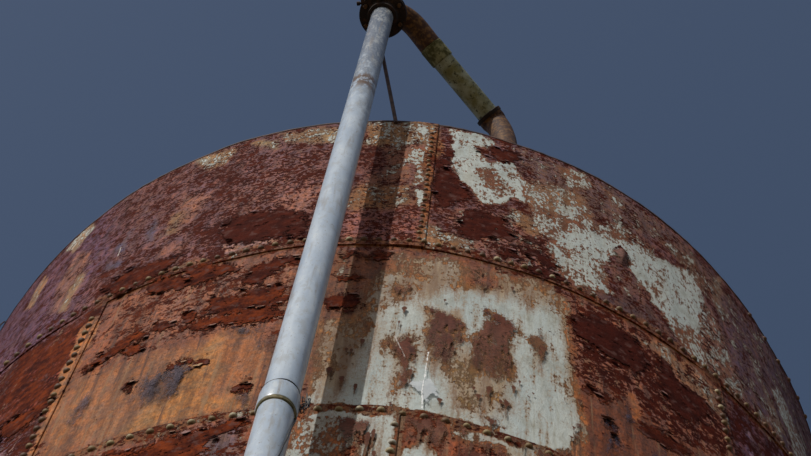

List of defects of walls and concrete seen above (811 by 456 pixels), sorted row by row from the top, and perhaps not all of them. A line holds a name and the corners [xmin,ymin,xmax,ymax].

peeling [429,144,569,285]
peeling [323,270,366,314]